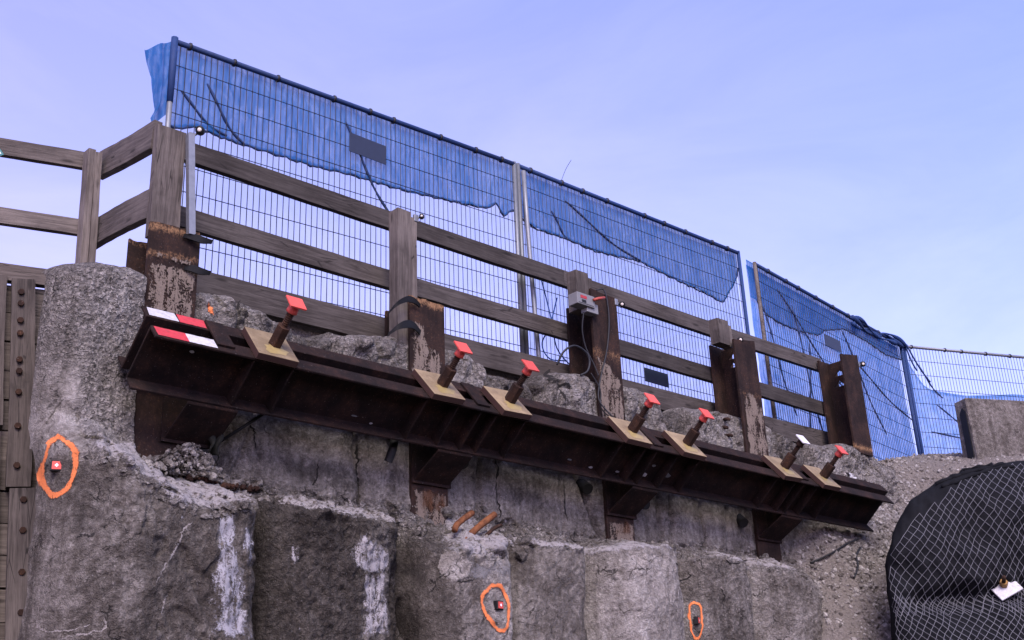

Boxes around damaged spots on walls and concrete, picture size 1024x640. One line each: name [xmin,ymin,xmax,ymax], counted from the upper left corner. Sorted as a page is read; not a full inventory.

spalling [83,434,253,540]
efflorescence [211,516,253,637]
crack [353,445,361,483]
efflorescence [352,536,389,637]
spalling [280,484,799,582]